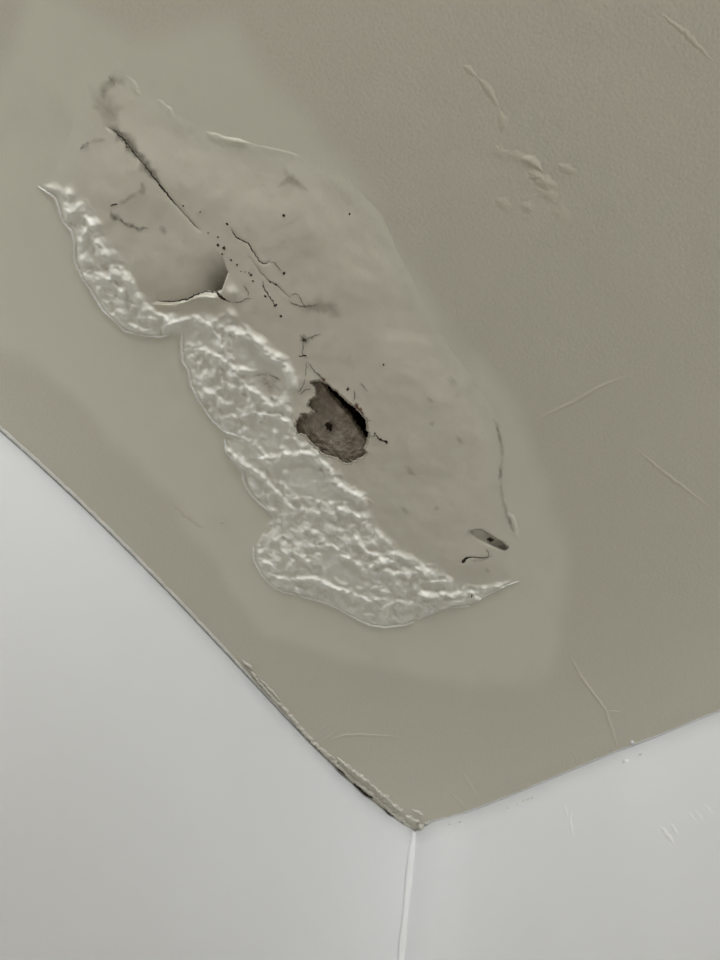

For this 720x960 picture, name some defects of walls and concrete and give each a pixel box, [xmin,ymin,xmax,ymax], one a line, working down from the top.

crack [108,127,198,228]
crack [160,223,314,318]
flaking render [38,185,519,628]
flaking render [242,660,430,830]